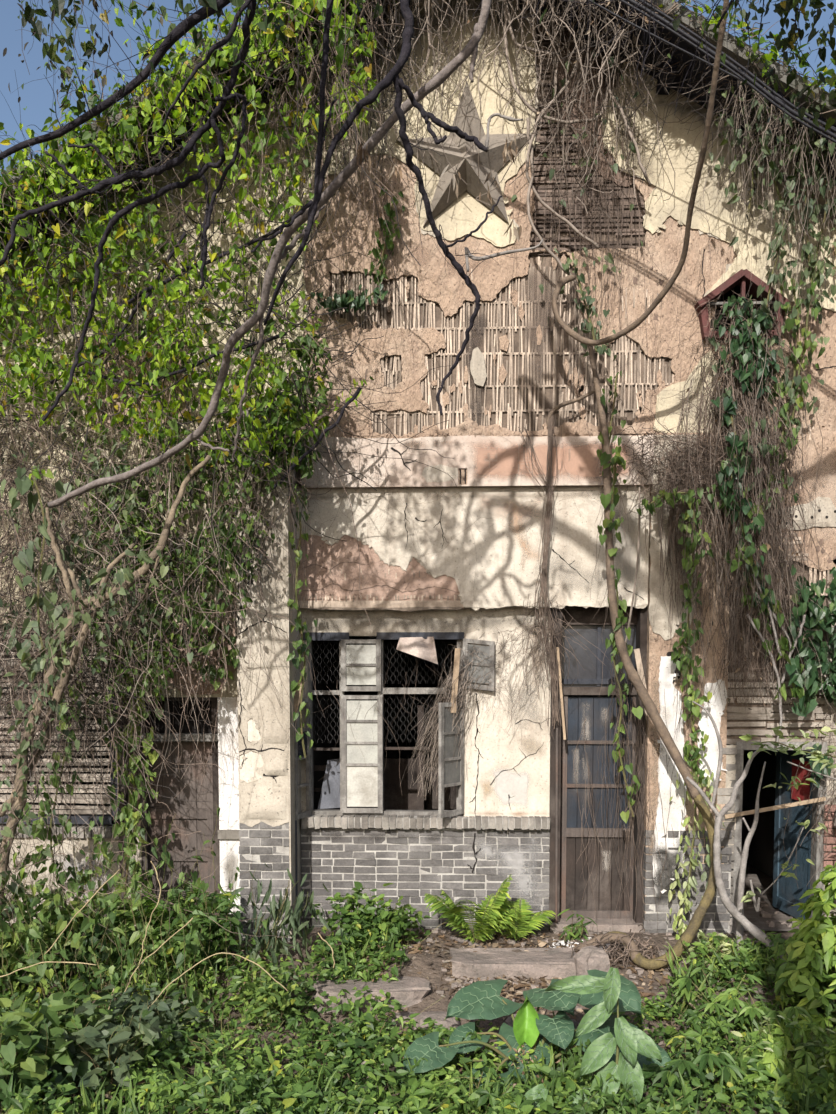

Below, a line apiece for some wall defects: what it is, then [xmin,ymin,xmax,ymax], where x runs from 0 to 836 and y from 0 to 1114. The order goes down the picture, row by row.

peeling [300,154,737,438]
peeling [764,302,836,508]
peeling [297,535,466,603]
crack [404,503,447,546]
peeling [768,527,836,571]
crack [239,681,288,783]
crack [467,693,550,873]
peeling [652,650,727,894]